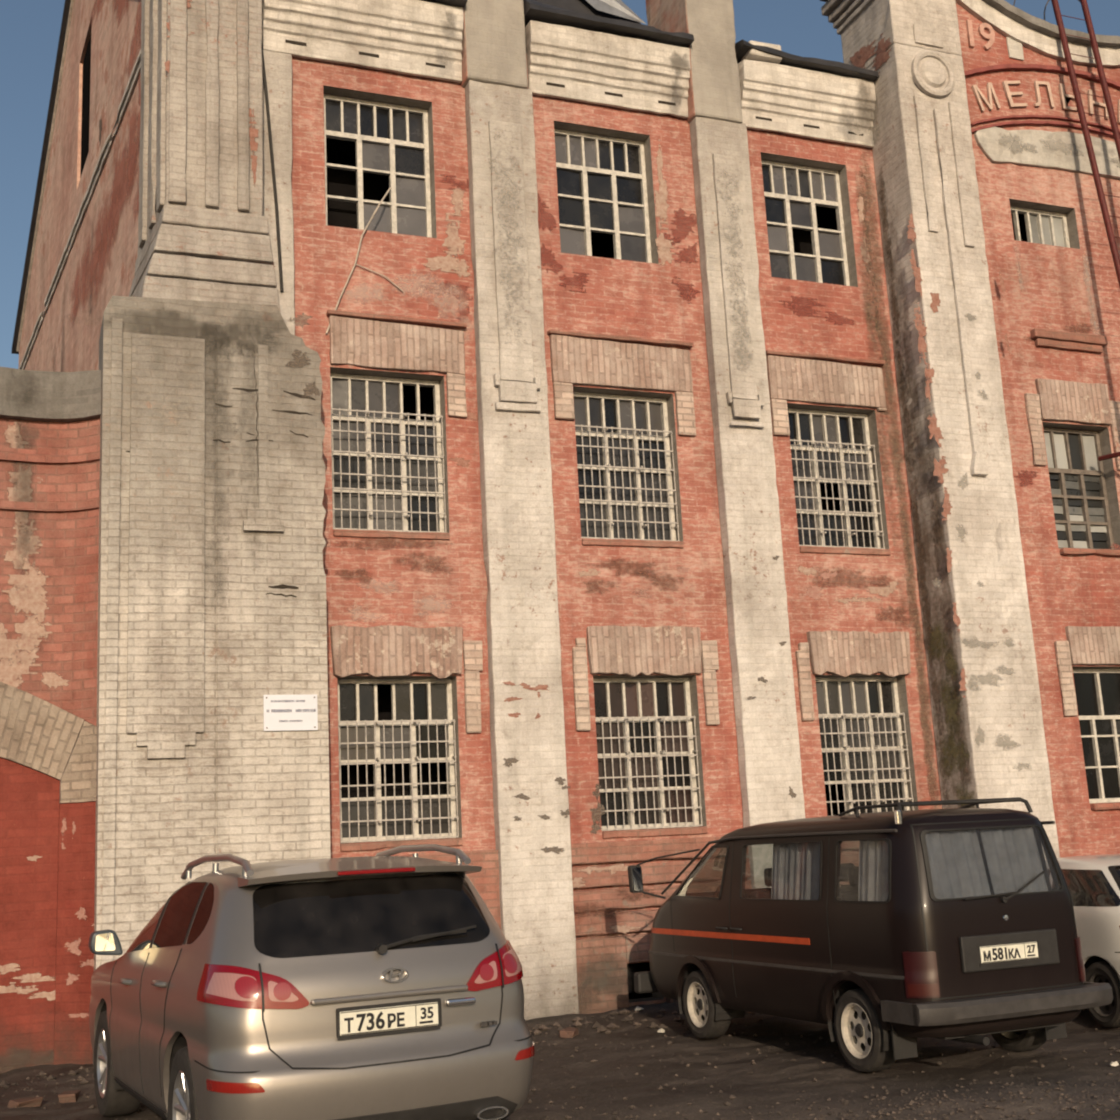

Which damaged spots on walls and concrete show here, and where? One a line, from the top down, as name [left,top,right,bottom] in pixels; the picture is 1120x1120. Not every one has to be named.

flaking render [421,174,472,326]
flaking render [654,139,698,265]
peeling [672,277,700,304]
peeling [907,210,941,401]
flaking render [4,421,29,449]
crack [213,339,316,485]
peeling [927,414,968,539]
leakage [880,179,1017,782]
flaking render [0,465,70,689]
crack [266,584,299,597]
peeling [502,681,548,718]
spalling [0,938,94,1001]